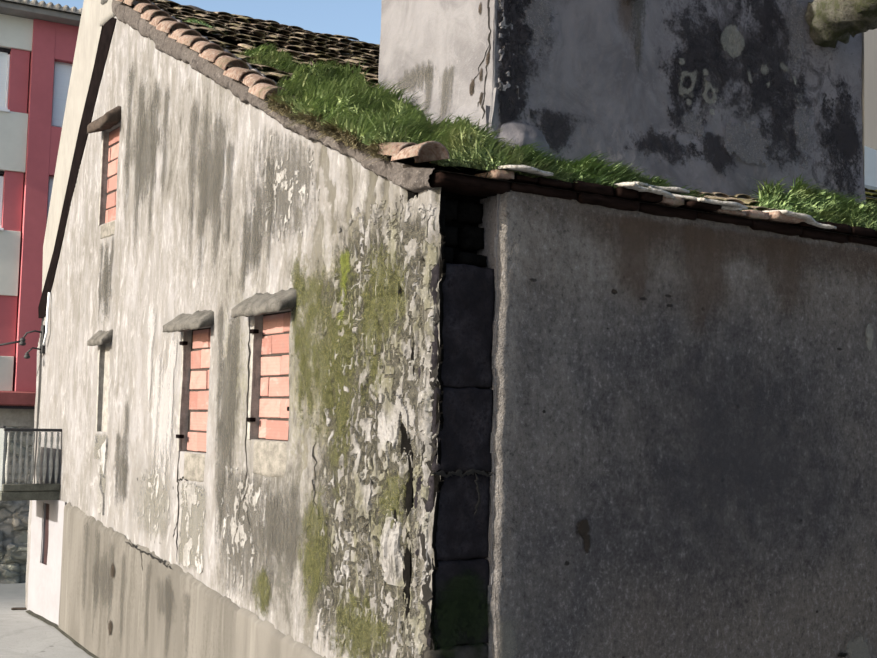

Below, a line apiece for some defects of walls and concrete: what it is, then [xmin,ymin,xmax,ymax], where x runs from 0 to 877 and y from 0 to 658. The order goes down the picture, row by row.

leakage [98,239,113,315]
leakage [125,67,169,240]
leakage [188,107,233,260]
leakage [241,163,274,291]
flaking render [249,132,320,242]
crack [473,0,491,119]
leakage [498,0,577,152]
leakage [625,47,736,176]
flaking render [313,195,438,658]
crack [126,457,188,570]
flaking render [137,465,205,574]
flaking render [216,466,275,598]